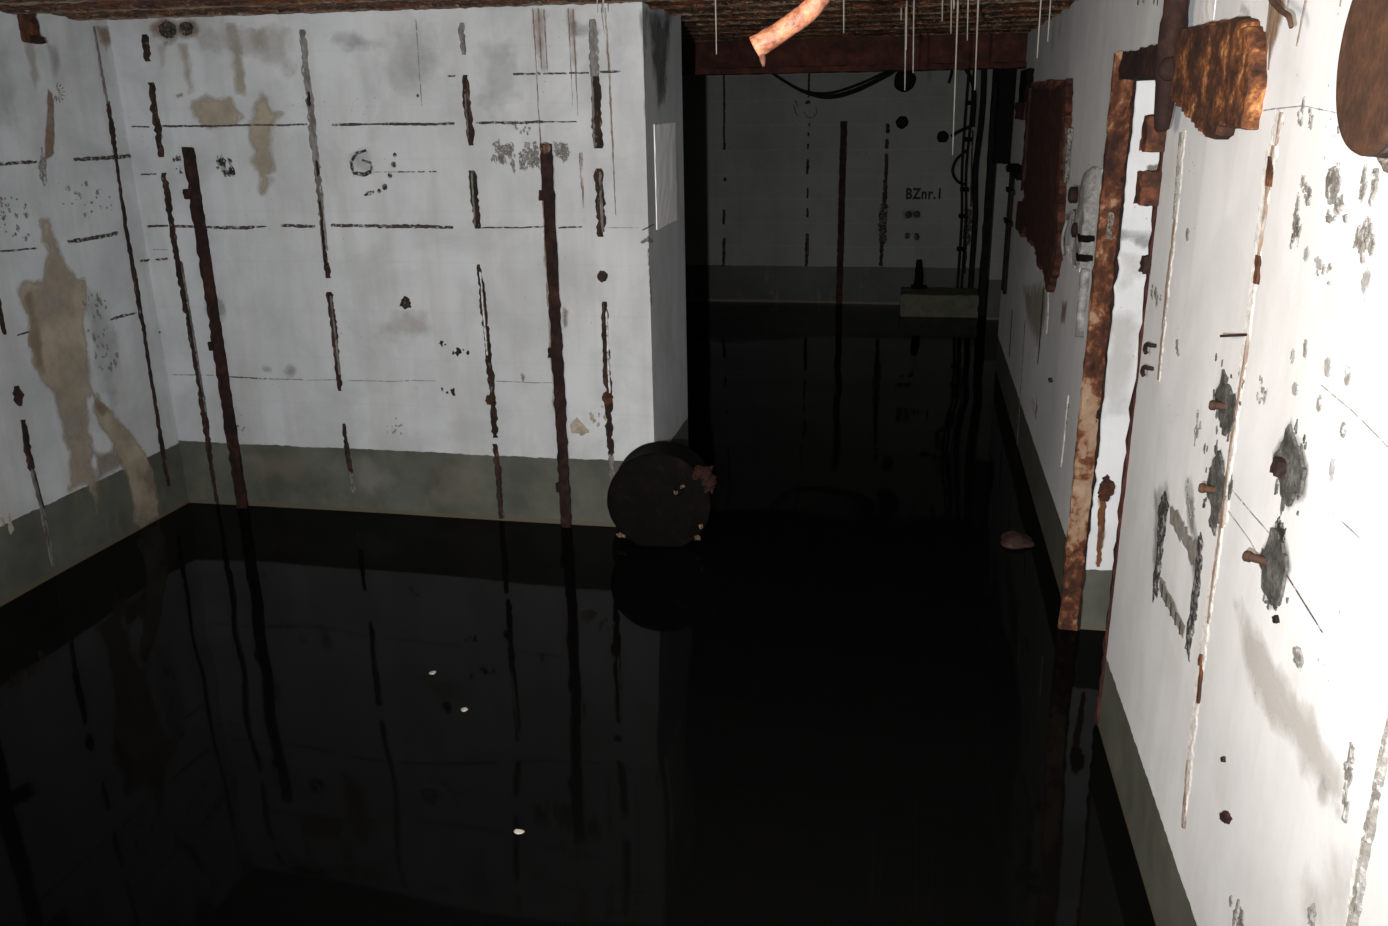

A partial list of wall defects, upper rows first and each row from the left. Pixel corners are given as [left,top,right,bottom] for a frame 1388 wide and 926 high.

damp [38,90,54,187]
damp [180,27,278,194]
damp [19,220,159,526]
rust [1096,474,1115,567]